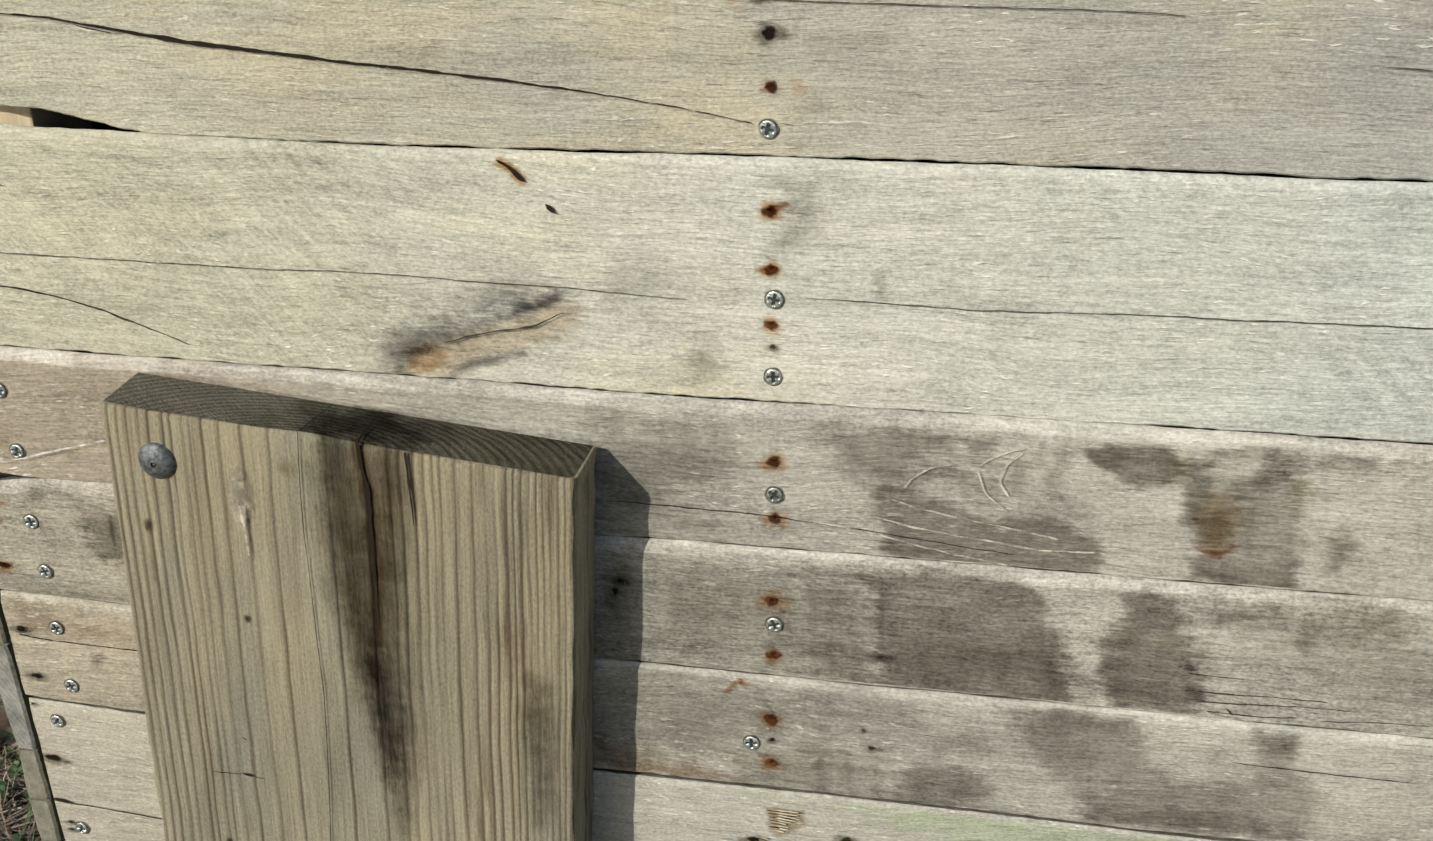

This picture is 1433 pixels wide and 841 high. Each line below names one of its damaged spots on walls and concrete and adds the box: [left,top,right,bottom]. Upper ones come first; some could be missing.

crack [0,13,790,125]
rust [765,81,776,93]
rust [761,205,776,217]
rust [765,264,778,275]
crack [0,252,680,345]
damp [311,410,428,442]
rust [766,456,779,467]